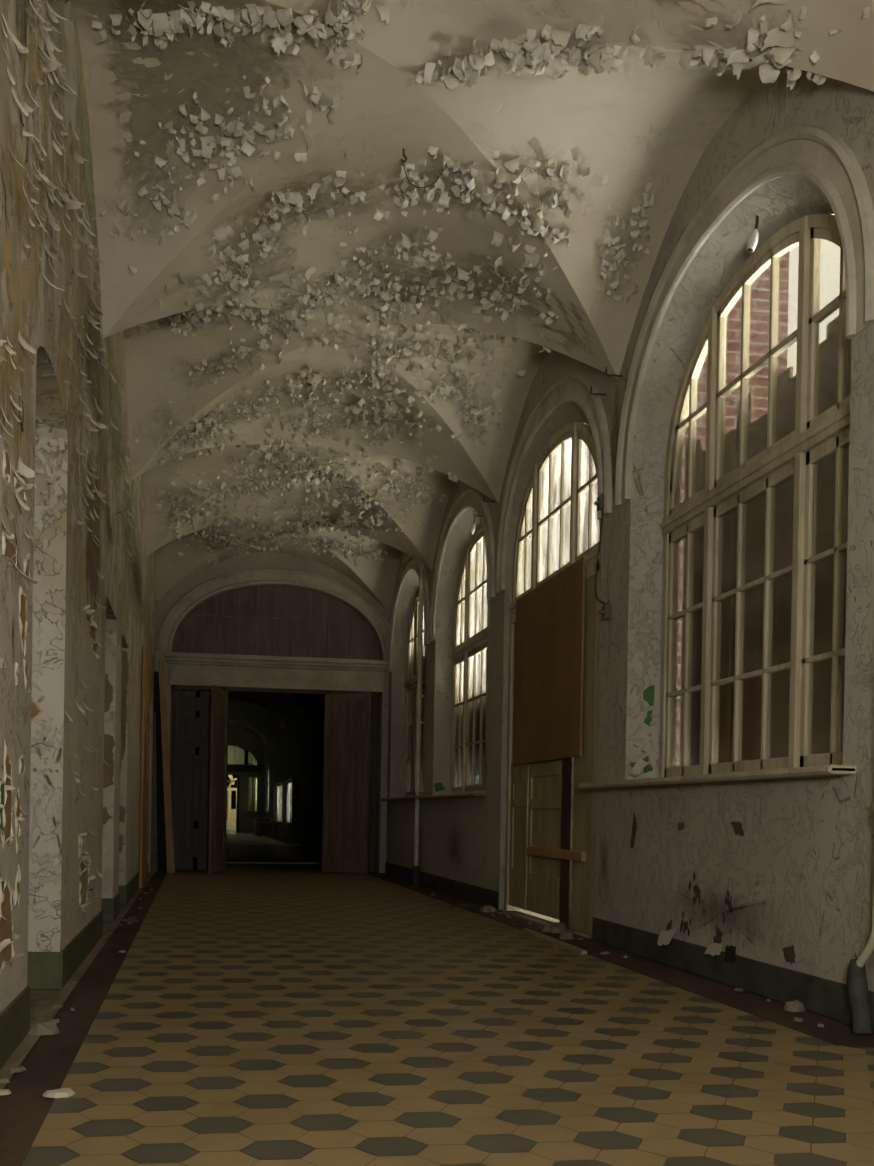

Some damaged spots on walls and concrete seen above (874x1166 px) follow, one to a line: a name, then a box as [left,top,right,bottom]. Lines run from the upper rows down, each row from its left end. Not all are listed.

peeling [92,0,390,73]
peeling [679,0,827,90]
peeling [596,183,655,302]
peeling [0,0,340,723]
peeling [126,137,610,570]
leakage [86,481,112,610]
peeling [65,598,129,797]
peeling [0,738,27,975]
peeling [78,805,126,914]